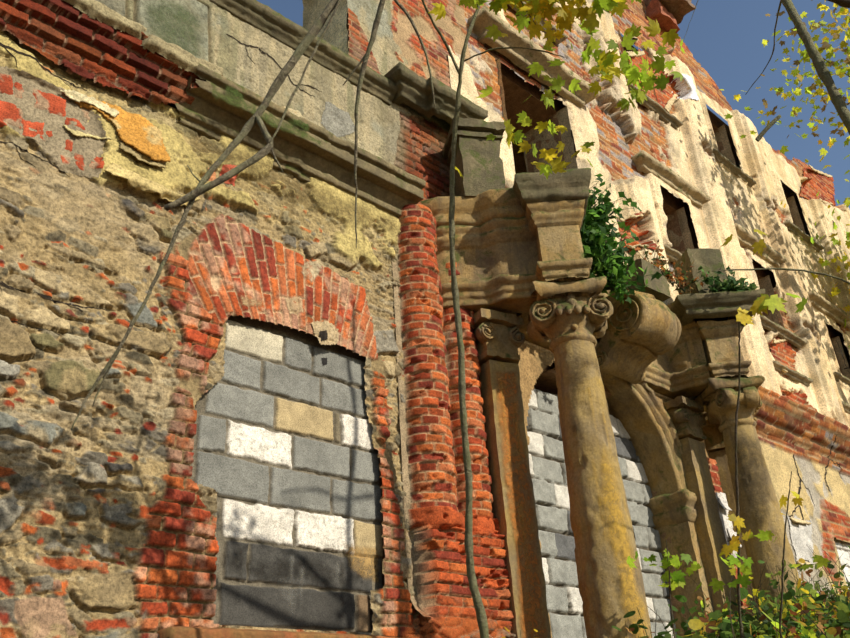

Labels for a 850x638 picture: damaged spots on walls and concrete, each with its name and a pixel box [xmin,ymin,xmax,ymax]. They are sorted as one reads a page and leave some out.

spalling [0,0,224,105]
crack [227,34,322,97]
flaking render [0,66,200,206]